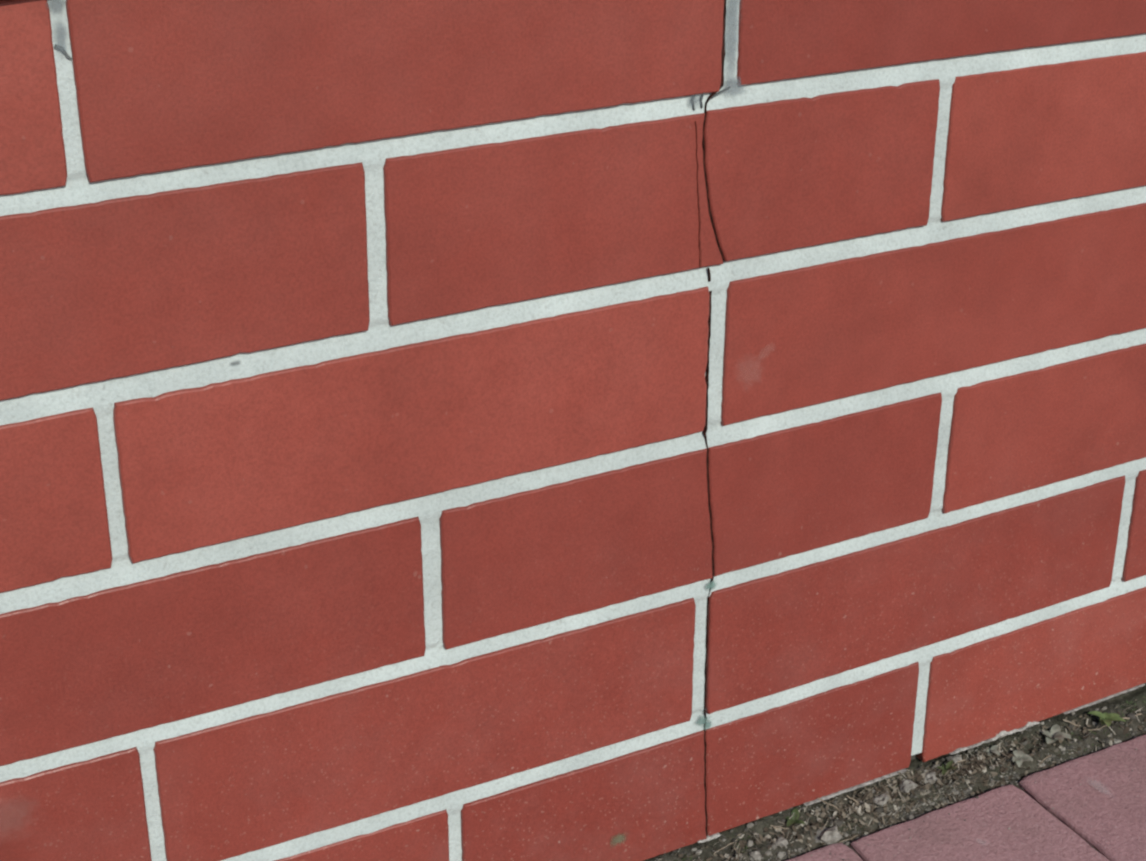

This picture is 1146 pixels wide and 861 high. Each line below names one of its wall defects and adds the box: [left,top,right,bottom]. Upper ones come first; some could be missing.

crack [691,0,731,842]